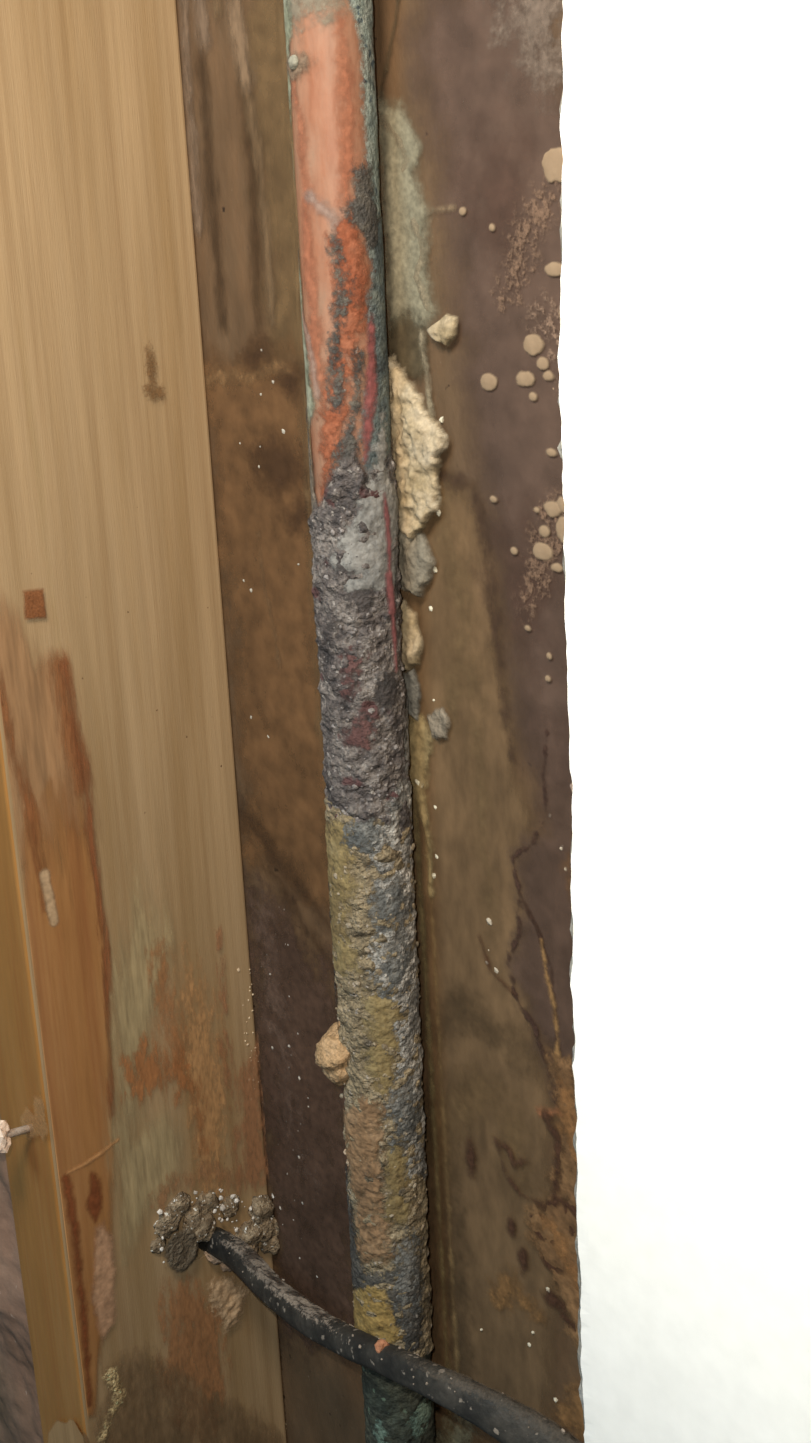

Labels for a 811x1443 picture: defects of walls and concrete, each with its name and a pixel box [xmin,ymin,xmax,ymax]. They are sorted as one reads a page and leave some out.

peeling [480,373,497,390]
peeling [489,147,563,401]
peeling [510,492,565,631]
crack [485,730,567,1104]
rust [494,1053,579,1346]